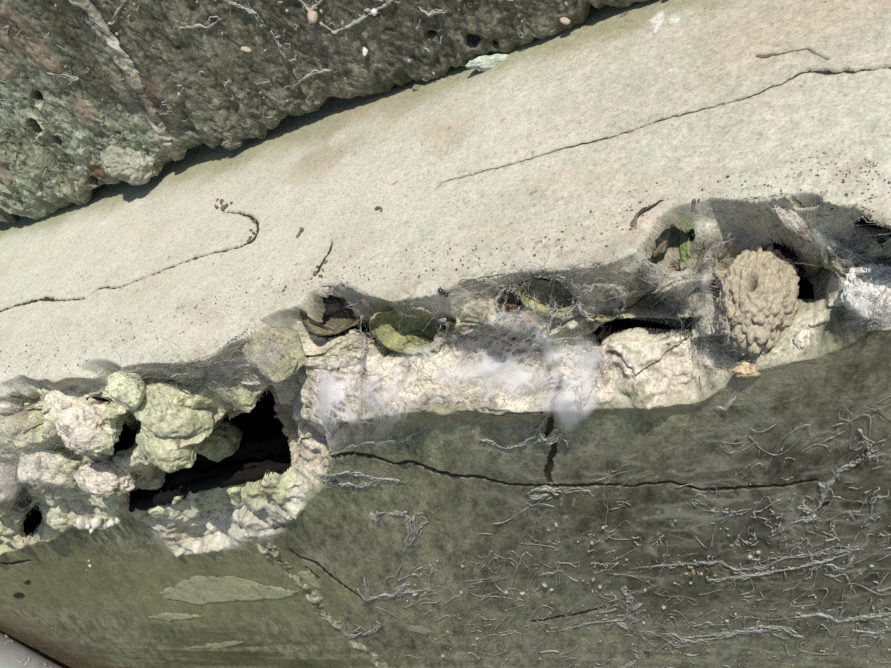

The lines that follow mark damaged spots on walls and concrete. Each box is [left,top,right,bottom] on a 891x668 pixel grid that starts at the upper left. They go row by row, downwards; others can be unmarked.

crack [439,48,891,183]
crack [0,212,259,312]
spalling [0,193,891,557]
crack [321,381,817,491]